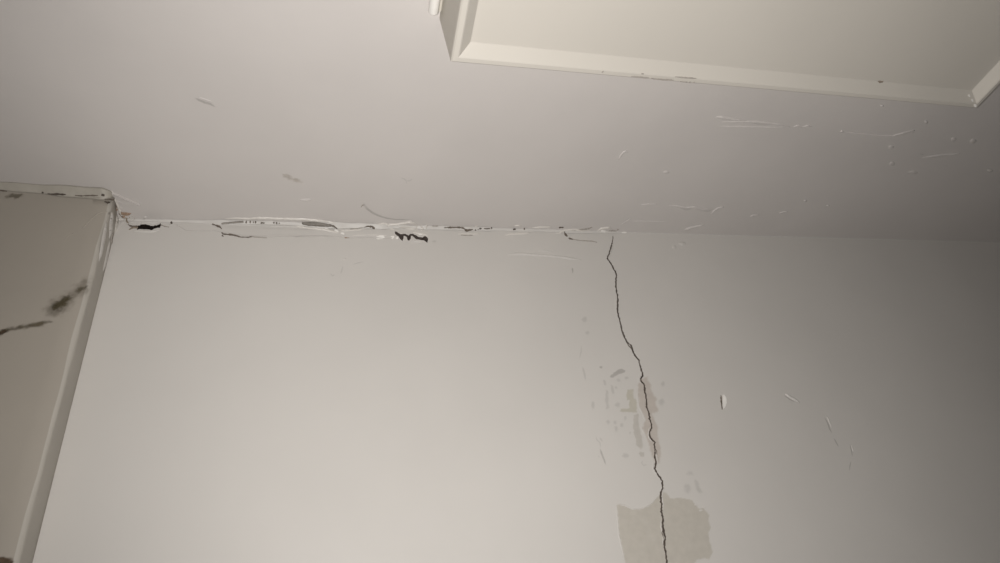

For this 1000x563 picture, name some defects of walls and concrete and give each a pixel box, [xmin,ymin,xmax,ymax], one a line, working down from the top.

crack [212,221,280,238]
crack [361,202,492,236]
crack [556,227,668,563]
peeling [616,491,714,563]